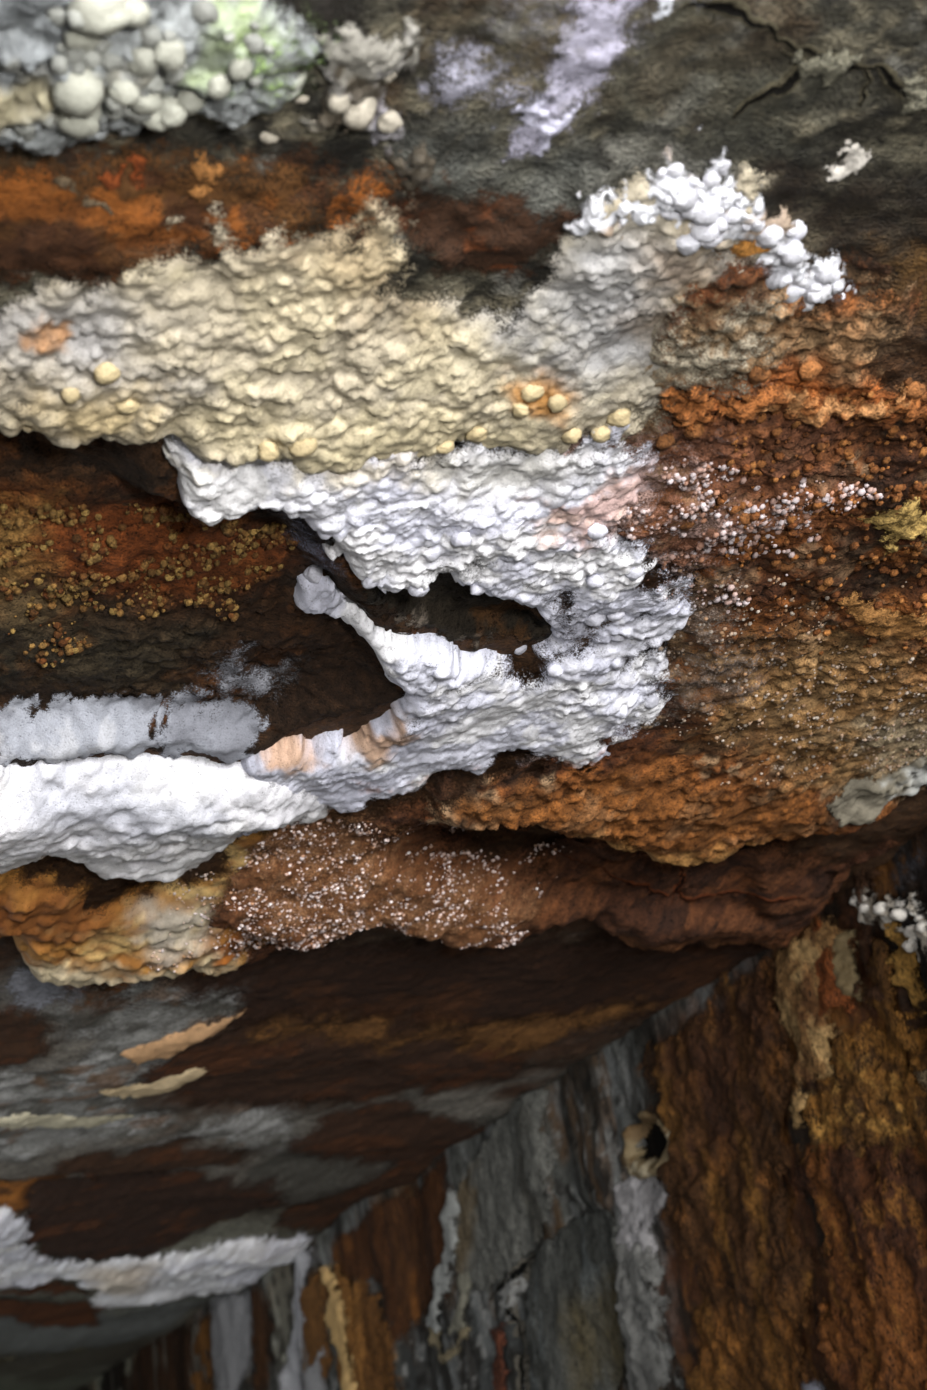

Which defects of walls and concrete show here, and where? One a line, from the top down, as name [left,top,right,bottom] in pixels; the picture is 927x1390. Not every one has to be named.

rust [0,130,584,291]
water stain [0,0,673,192]
crack [679,0,927,119]
water stain [826,140,872,182]
water stain [0,146,857,1206]
rust [72,256,927,1390]
water stain [849,826,927,1009]
rust [0,1004,65,1069]
rust [0,1280,106,1330]
rust [0,1136,292,1263]
water stain [0,1205,328,1390]
water stain [612,1176,686,1390]